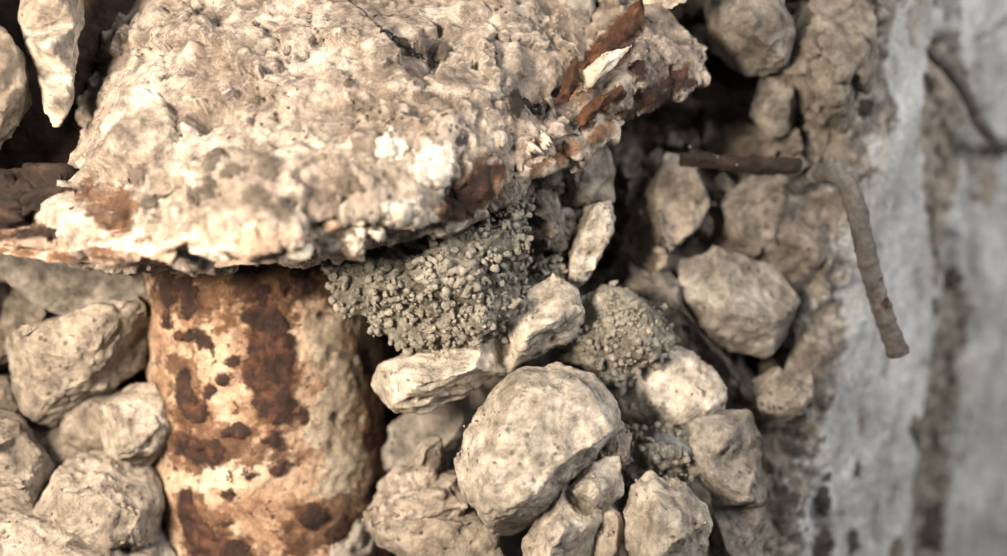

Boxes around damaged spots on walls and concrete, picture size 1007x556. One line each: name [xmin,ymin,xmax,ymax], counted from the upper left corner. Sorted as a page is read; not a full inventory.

peeling [643,0,687,9]
spalling [505,88,543,119]
corrosion [530,0,698,177]
spalling [126,163,158,209]
spalling [183,146,241,208]
spalling [240,152,297,236]
spalling [334,173,365,195]
corrosion [436,149,508,222]
spalling [766,0,1007,556]
corrosion [0,174,383,556]
peeling [300,310,371,500]
peeling [330,520,388,556]